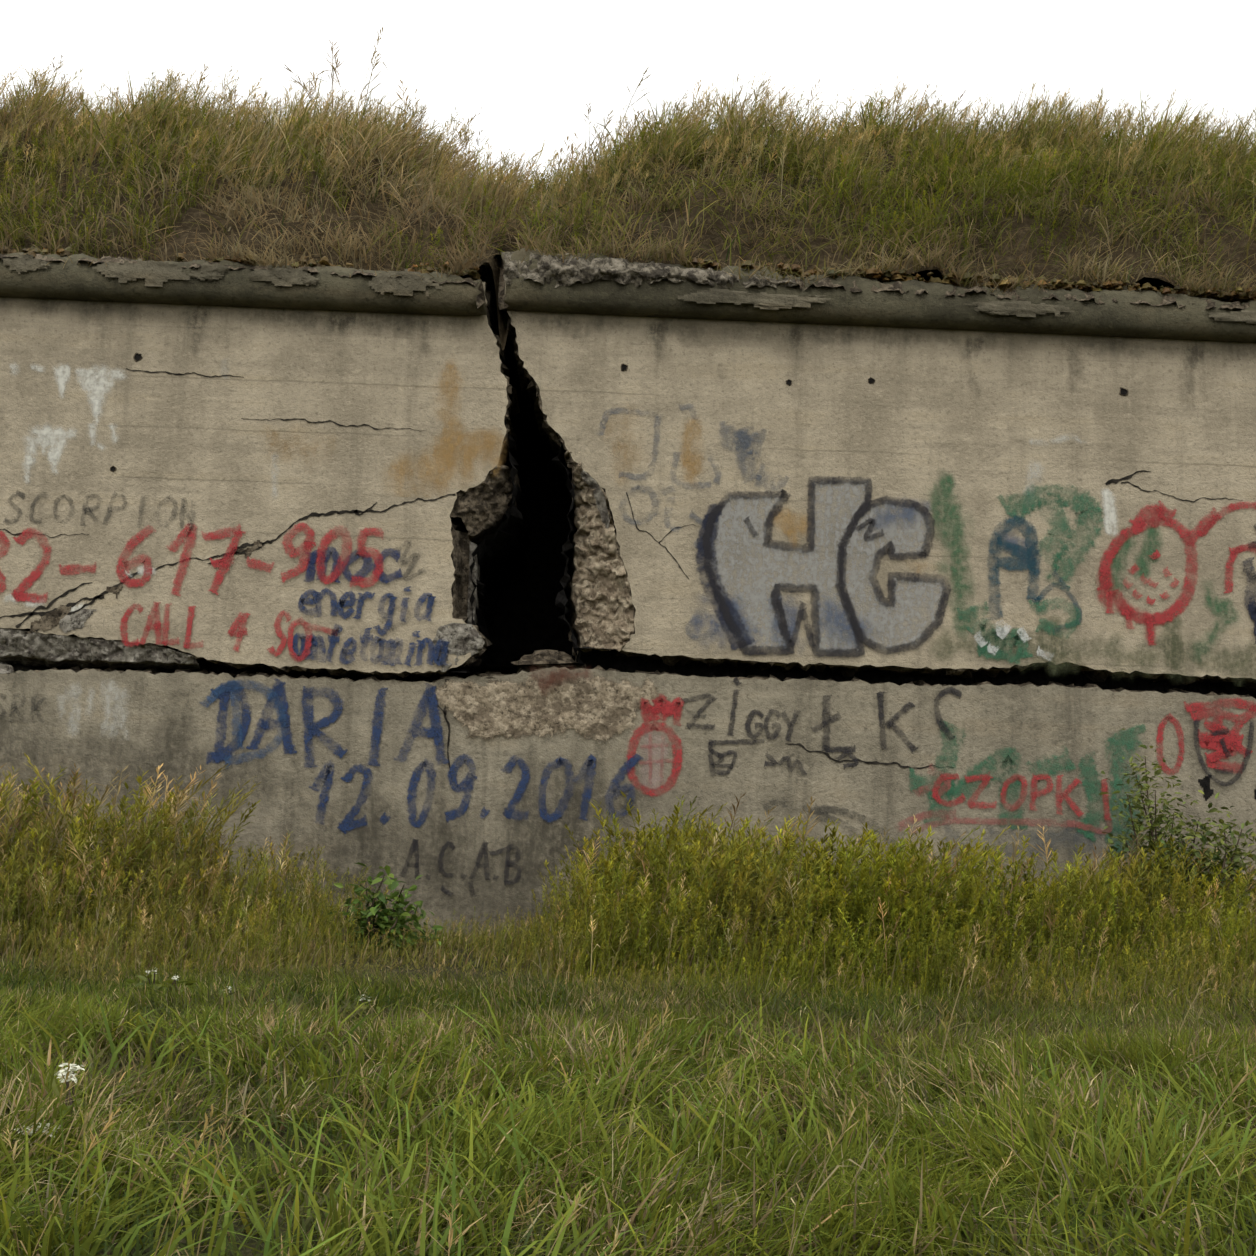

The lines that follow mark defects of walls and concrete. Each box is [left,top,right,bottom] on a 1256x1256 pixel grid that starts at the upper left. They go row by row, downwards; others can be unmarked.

peeling [0,253,477,296]
spalling [503,252,1256,324]
damp [32,366,123,449]
damp [26,427,73,479]
crack [0,254,1256,782]
spalling [431,623,669,742]